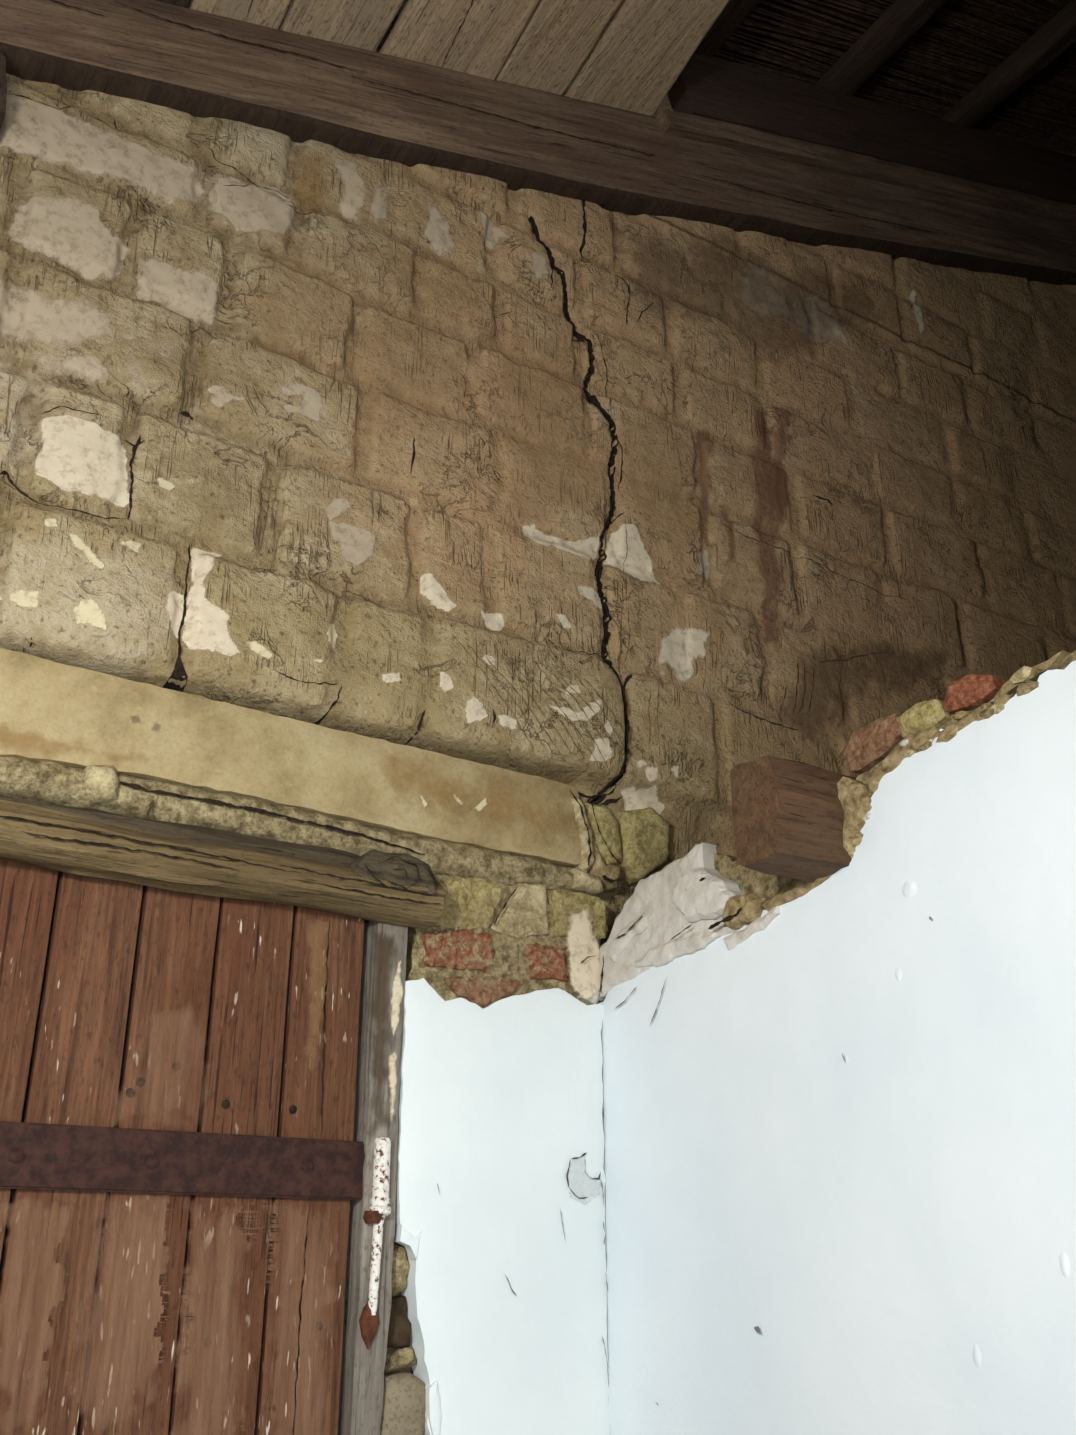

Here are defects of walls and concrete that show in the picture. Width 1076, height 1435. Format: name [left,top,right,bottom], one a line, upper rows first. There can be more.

peeling [8,196,129,280]
peeling [136,258,217,325]
peeling [35,415,129,507]
crack [528,200,653,806]
crack [178,544,191,656]
peeling [162,548,272,692]
peeling [522,524,661,585]
peeling [658,628,710,682]
peeling [550,685,615,762]
spalling [846,674,1007,774]
spalling [391,760,781,1035]
peeling [389,1052,397,1113]